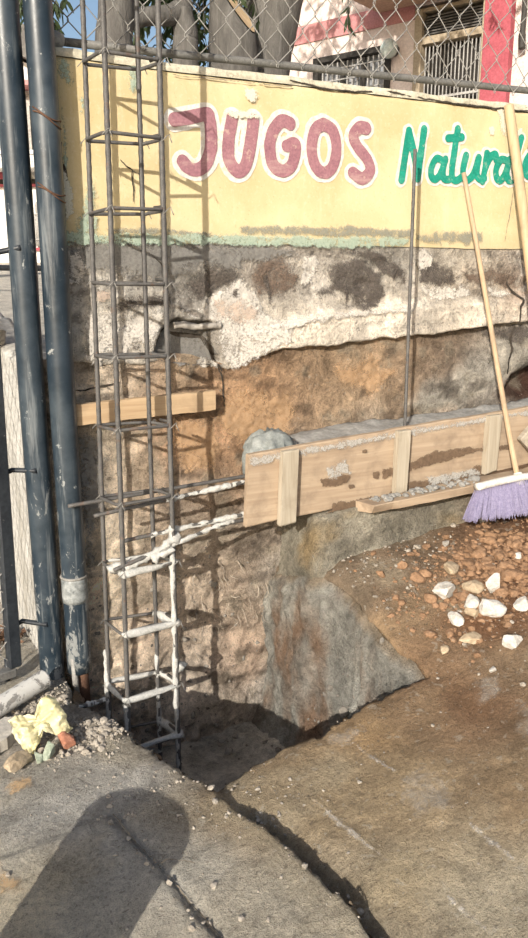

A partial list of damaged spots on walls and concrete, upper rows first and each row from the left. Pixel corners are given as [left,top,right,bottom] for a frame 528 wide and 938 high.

damp [241,225,482,244]
damp [68,228,298,314]
peeling [63,125,470,426]
damp [317,250,406,312]
damp [417,261,516,288]
peeling [487,287,510,298]
crack [506,276,525,374]